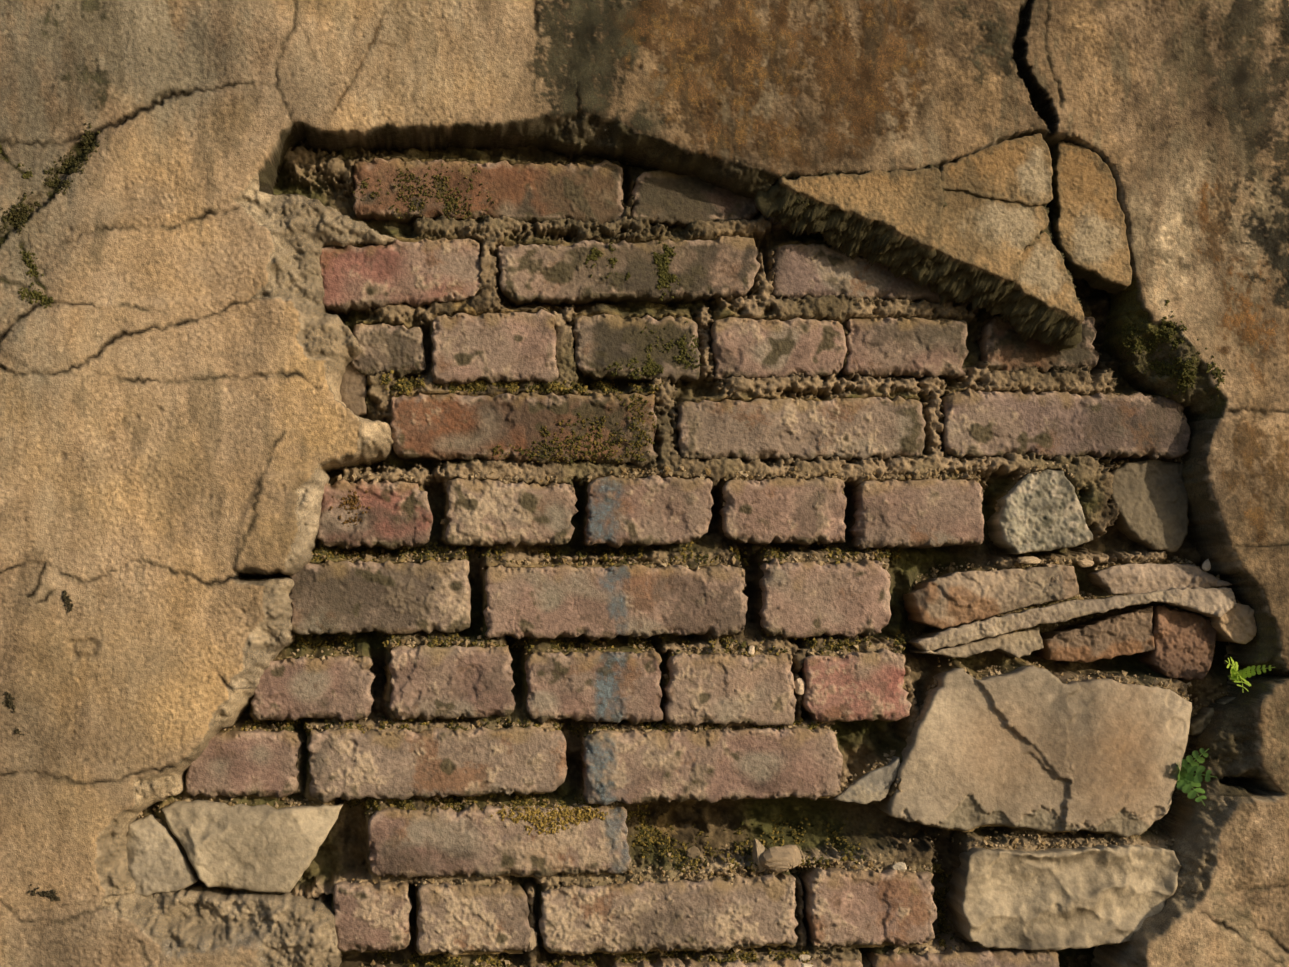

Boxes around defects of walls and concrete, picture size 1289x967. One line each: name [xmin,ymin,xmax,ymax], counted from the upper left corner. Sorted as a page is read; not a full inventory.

crack [0,83,243,375]
flaking render [237,111,1227,581]
crack [1011,0,1061,137]
damp [1200,0,1289,309]
crack [0,563,72,602]
crack [151,563,287,585]
crack [54,765,175,784]
spalling [97,622,295,963]
spalling [1132,569,1285,942]
crack [1207,914,1289,962]